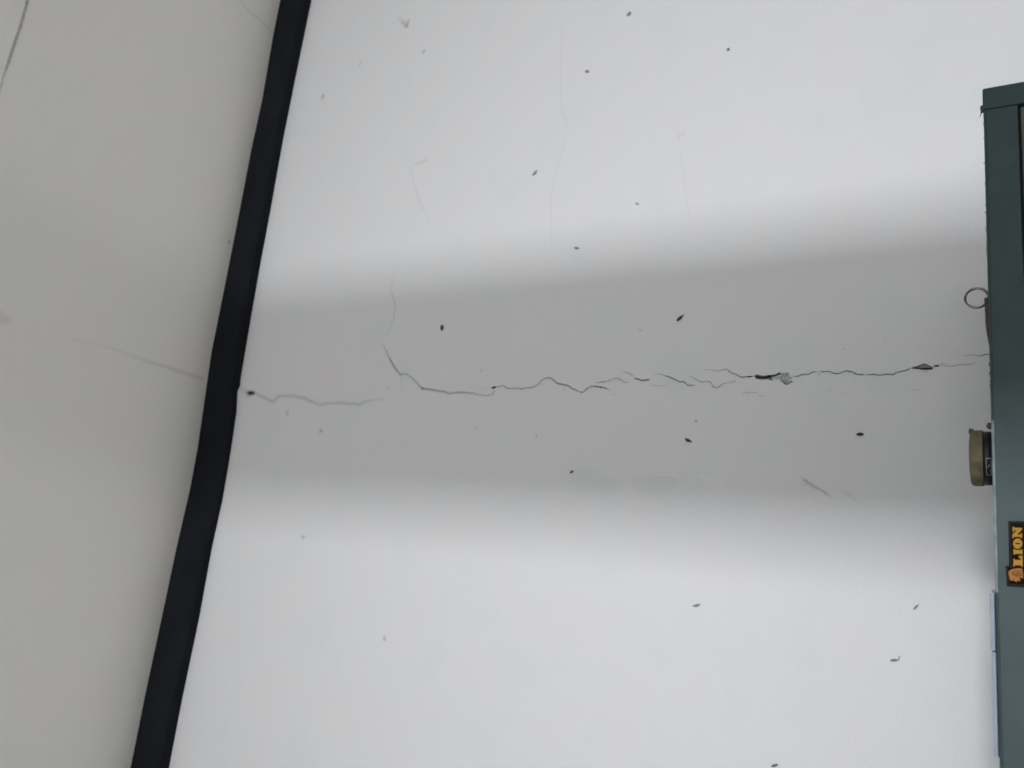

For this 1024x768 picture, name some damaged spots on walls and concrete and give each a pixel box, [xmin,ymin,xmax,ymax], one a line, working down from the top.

crack [634,369,753,388]
crack [795,369,909,377]